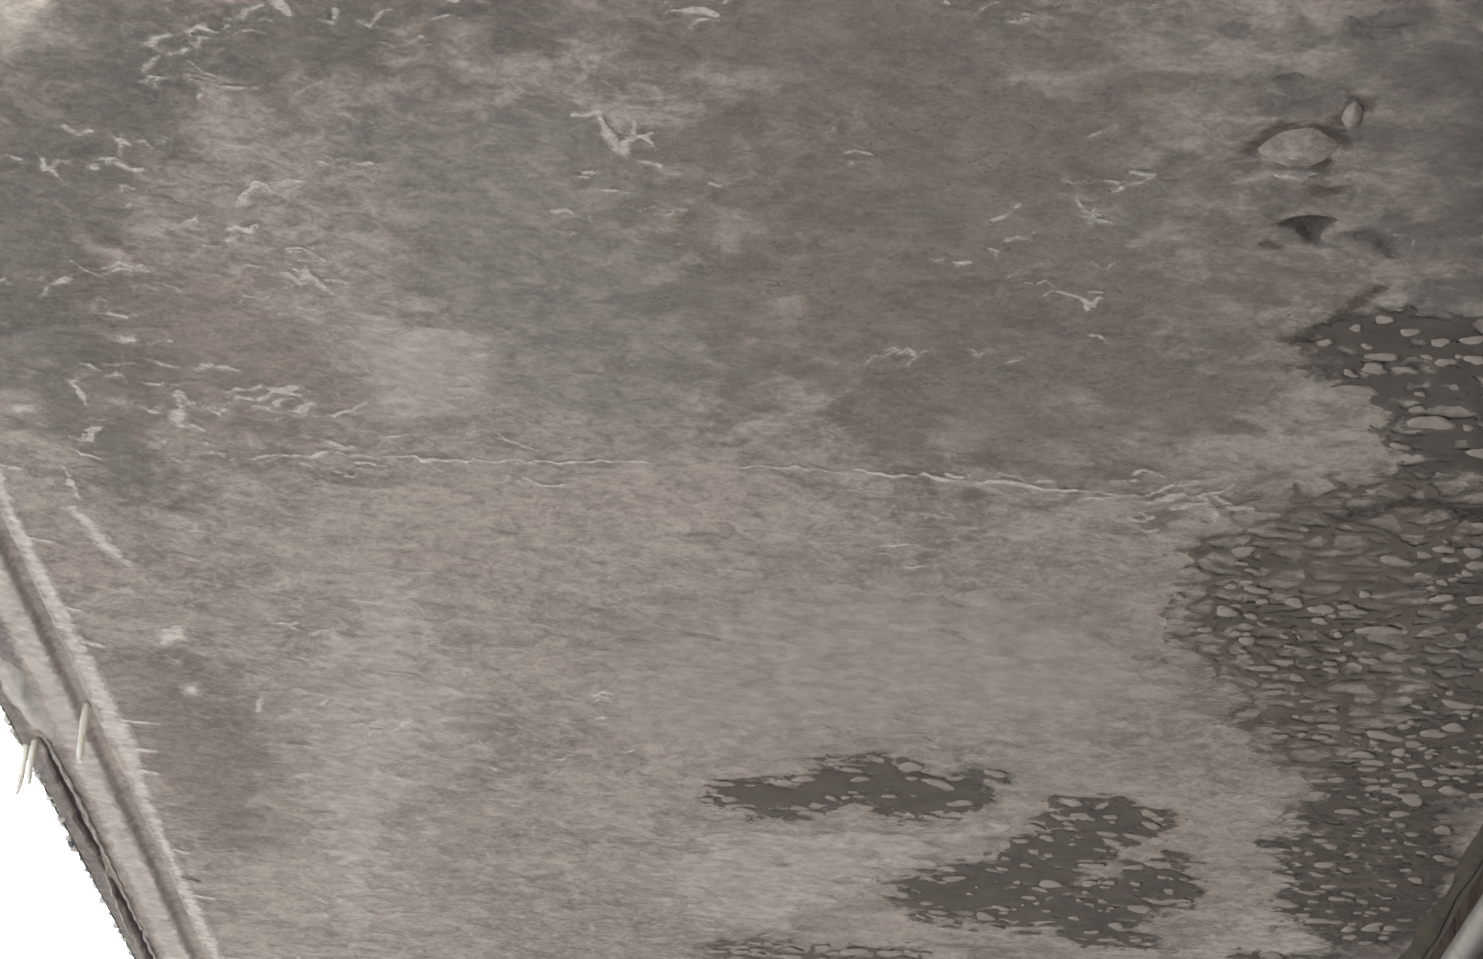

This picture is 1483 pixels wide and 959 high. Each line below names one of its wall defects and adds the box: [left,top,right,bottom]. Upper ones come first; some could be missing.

water stain [0,0,418,483]
water stain [195,290,499,433]
water stain [562,0,1258,533]
water stain [0,464,236,959]
water stain [255,539,515,959]
water stain [634,818,1010,934]
water stain [541,543,1147,762]
water stain [1175,795,1371,959]